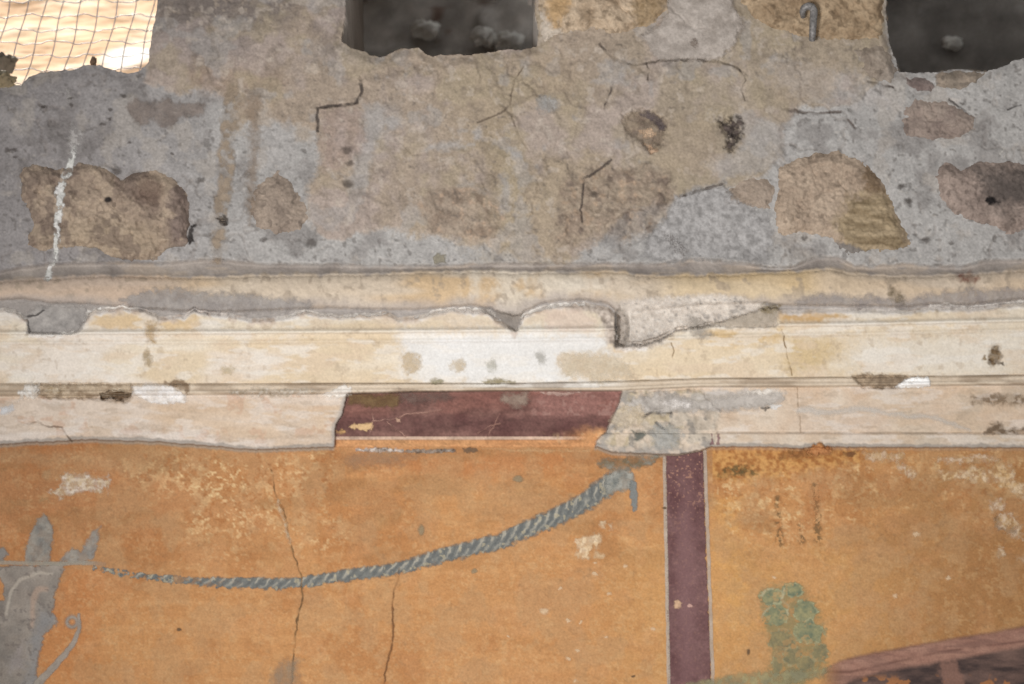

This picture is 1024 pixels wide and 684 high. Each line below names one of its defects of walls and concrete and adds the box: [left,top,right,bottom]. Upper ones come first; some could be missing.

crack [316,85,363,132]
spalling [625,111,665,154]
spalling [718,118,744,149]
crack [579,159,612,222]
spalling [26,304,87,334]
spalling [611,388,785,427]
crack [291,546,303,681]
crack [384,593,394,682]